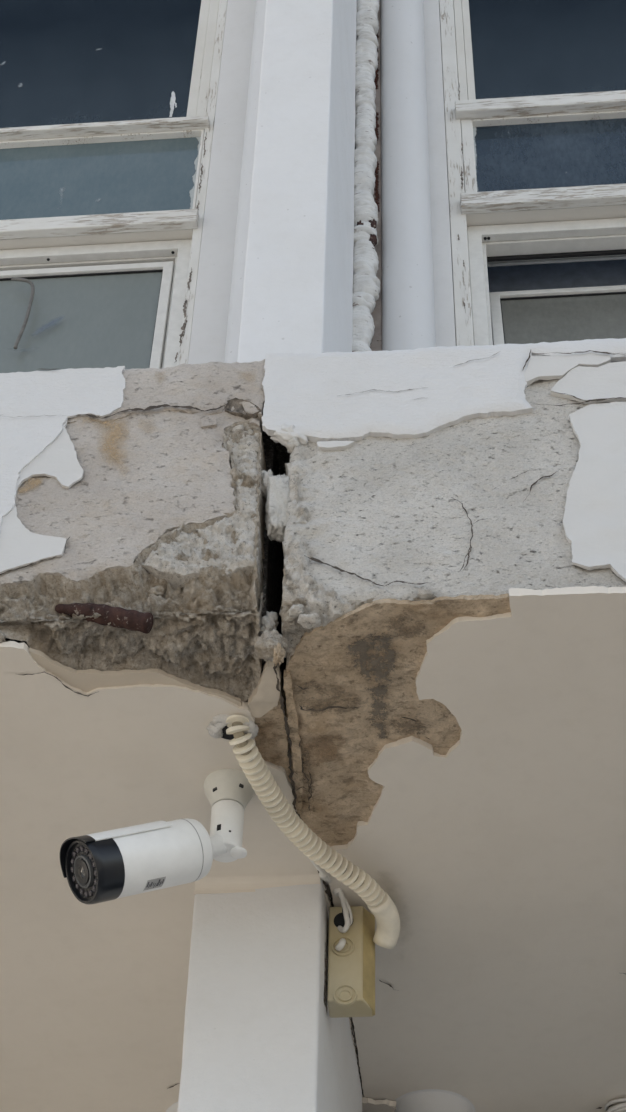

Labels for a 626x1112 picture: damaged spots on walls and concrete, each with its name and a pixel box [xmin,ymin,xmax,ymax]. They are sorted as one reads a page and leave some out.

flaking render [0,267,626,847]
water stain [299,614,425,739]